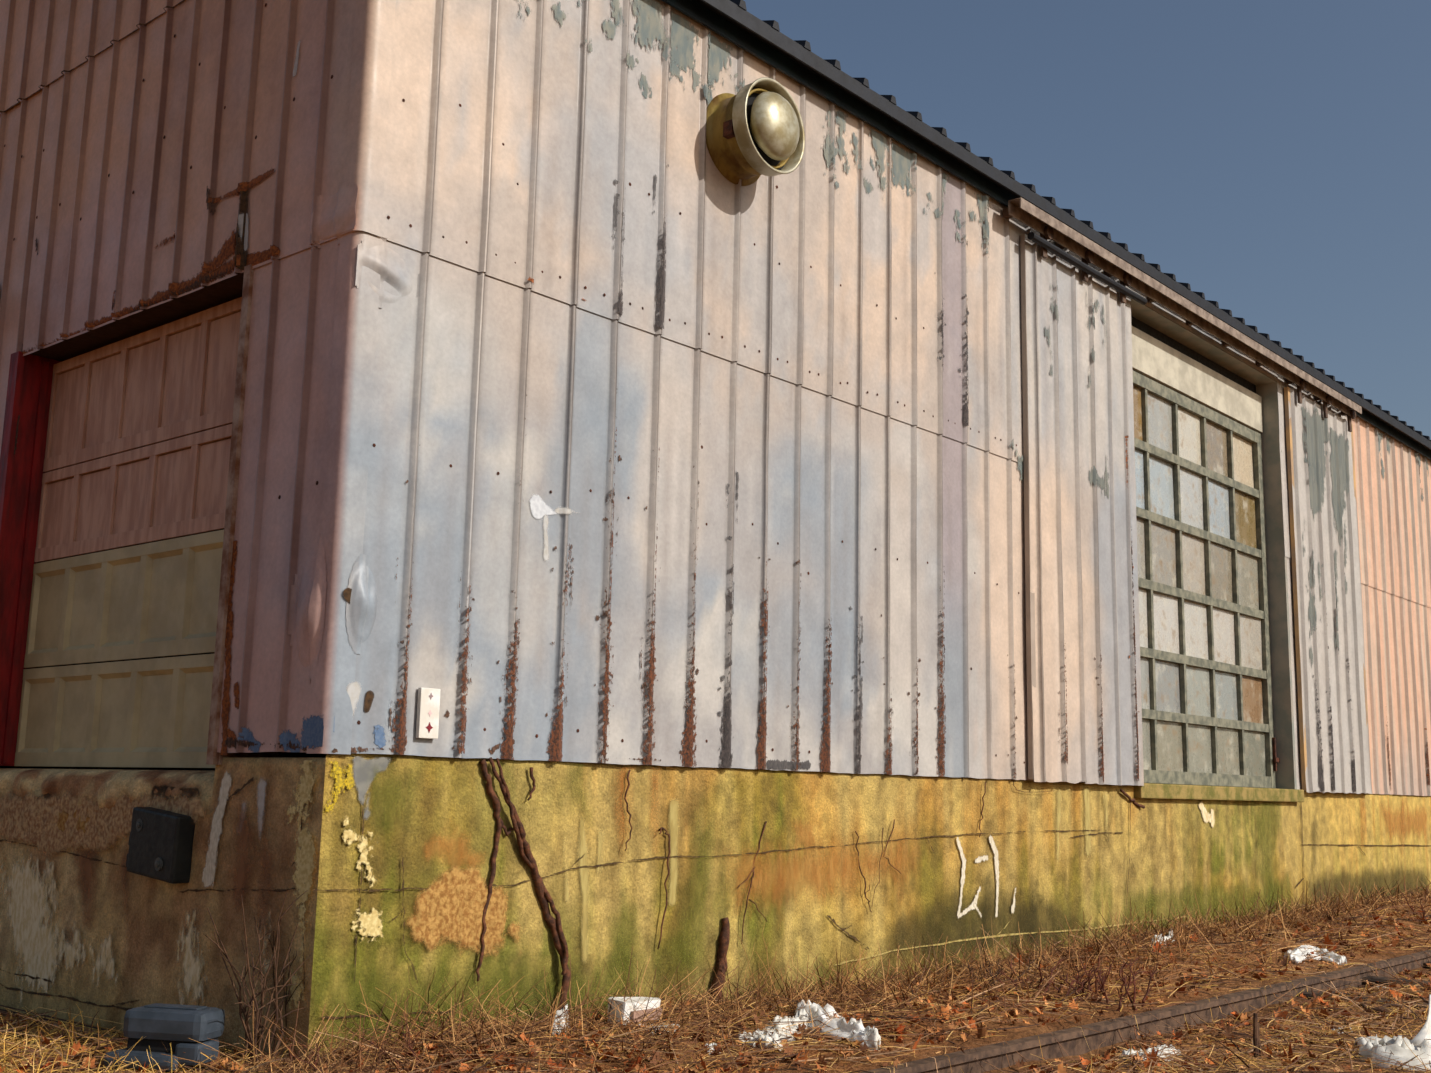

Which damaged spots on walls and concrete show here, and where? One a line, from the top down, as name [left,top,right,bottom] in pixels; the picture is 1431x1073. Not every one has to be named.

peeling [584,0,745,105]
peeling [821,104,990,254]
peeling [1300,403,1350,667]
corrosion [594,427,661,820]
corrosion [680,466,699,767]
corrosion [718,654,734,768]
corrosion [756,557,833,772]
peeling [279,715,335,1009]
leakage [565,819,604,961]
leakage [669,800,678,904]
leakage [896,903,1068,954]
leakage [1199,802,1215,827]